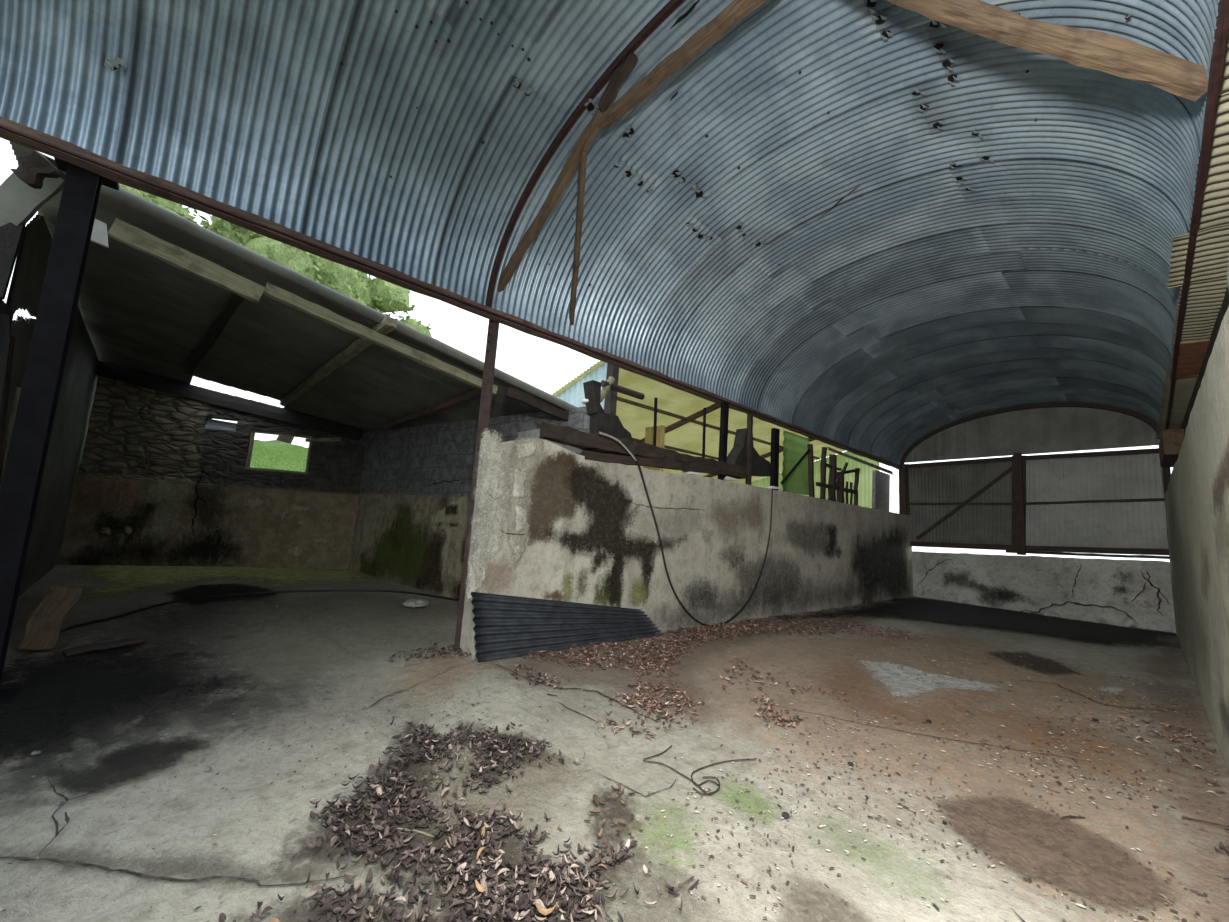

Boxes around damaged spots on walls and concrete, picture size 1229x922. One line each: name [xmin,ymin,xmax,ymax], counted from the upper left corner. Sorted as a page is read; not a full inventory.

water stain [68,530,242,566]
water stain [416,532,461,599]
water stain [526,453,687,607]
water stain [776,529,1180,646]
crack [1020,564,1169,625]
corrosion [1212,443,1229,511]
water stain [0,584,279,773]
water stain [990,652,1078,674]
crack [0,778,345,886]
water stain [940,796,1169,907]